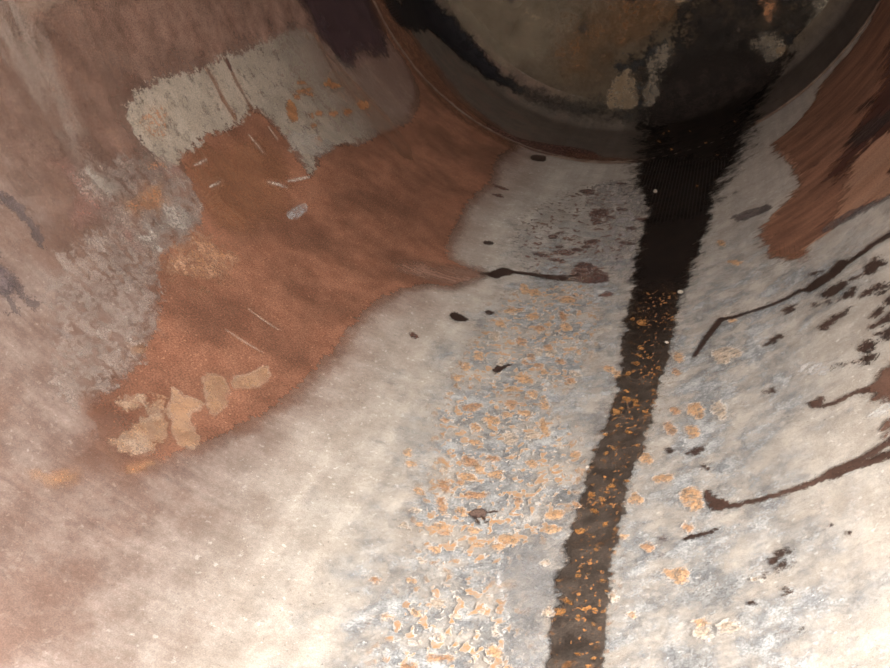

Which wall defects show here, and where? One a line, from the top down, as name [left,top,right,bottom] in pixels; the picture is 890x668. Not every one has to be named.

peeling [44,31,392,413]
rust [85,0,628,468]
rust [398,182,647,569]
leakage [300,0,890,668]
rust [662,400,728,439]
rust [711,346,743,365]
rust [678,485,706,535]
rust [661,566,692,585]
rust [380,577,513,668]
rust [690,617,742,641]